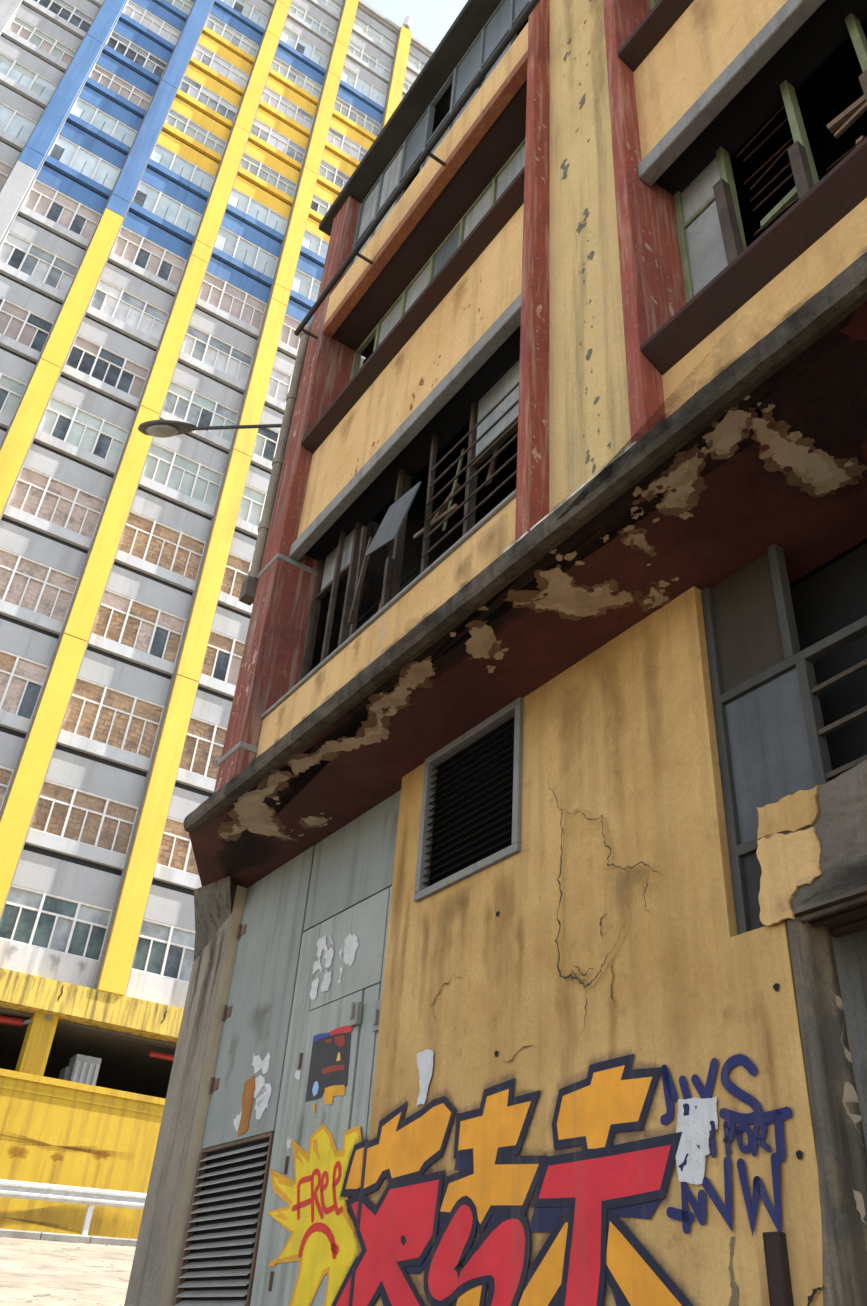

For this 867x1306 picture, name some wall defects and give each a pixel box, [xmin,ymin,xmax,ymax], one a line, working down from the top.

peeling [504,395,867,621]
peeling [450,605,509,673]
peeling [217,656,436,841]
spalling [756,760,867,926]
crack [549,774,663,1033]
peeling [831,991,852,1063]
peeling [842,1082,867,1152]
peeling [852,1188,867,1224]
crack [807,1286,824,1306]